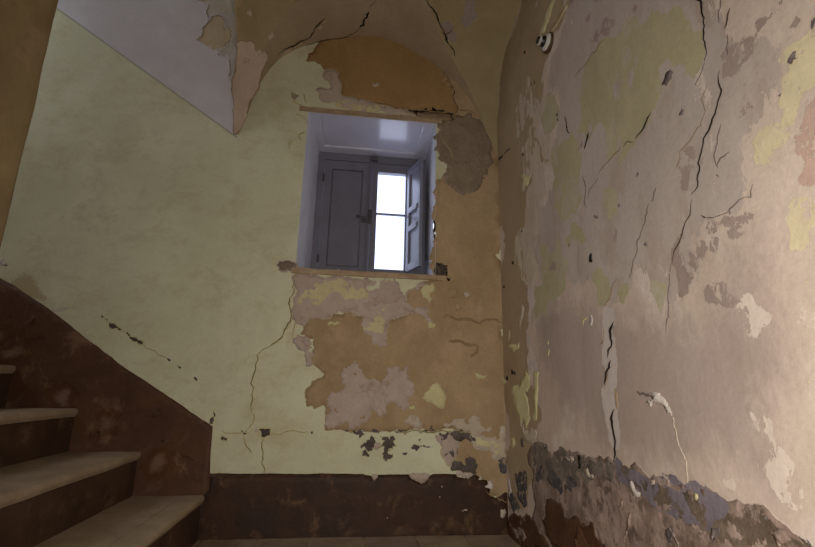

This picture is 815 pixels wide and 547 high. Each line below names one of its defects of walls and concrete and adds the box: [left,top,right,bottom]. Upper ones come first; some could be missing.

peeling [191,0,268,135]
crack [279,2,375,55]
crack [583,113,651,206]
crack [666,0,753,326]
peeling [795,116,815,187]
peeling [276,0,605,547]
crack [601,188,656,459]
peeling [703,281,742,308]
peeling [706,212,754,253]
crack [221,274,310,473]
peeling [637,391,672,416]
peeling [711,504,812,547]